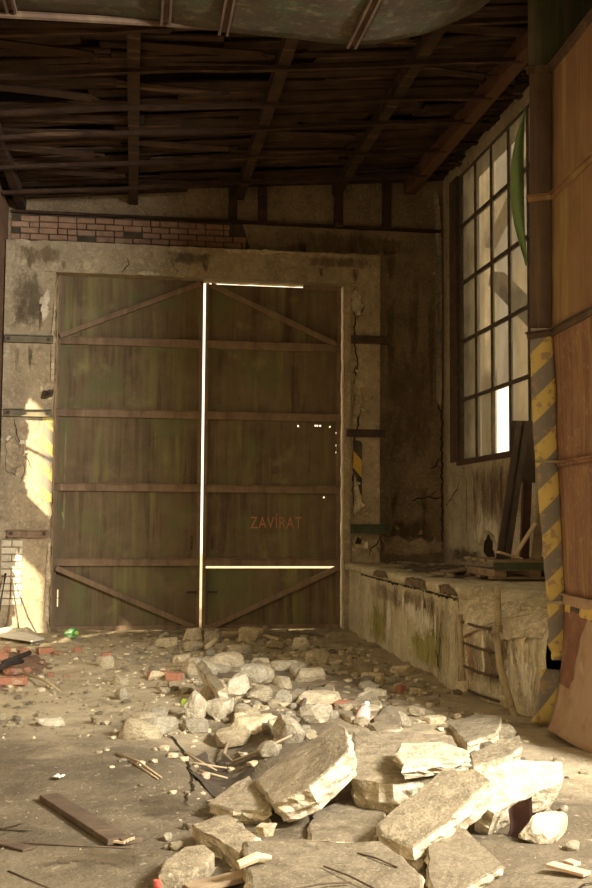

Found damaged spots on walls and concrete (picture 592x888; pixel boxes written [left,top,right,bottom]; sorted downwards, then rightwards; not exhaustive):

water stain [18,247,64,326]
crack [353,306,365,383]
crack [351,407,363,519]
crack [411,390,460,548]
flaking render [0,539,23,606]
hole [478,521,498,564]
water stain [366,585,457,667]
crack [160,734,195,806]